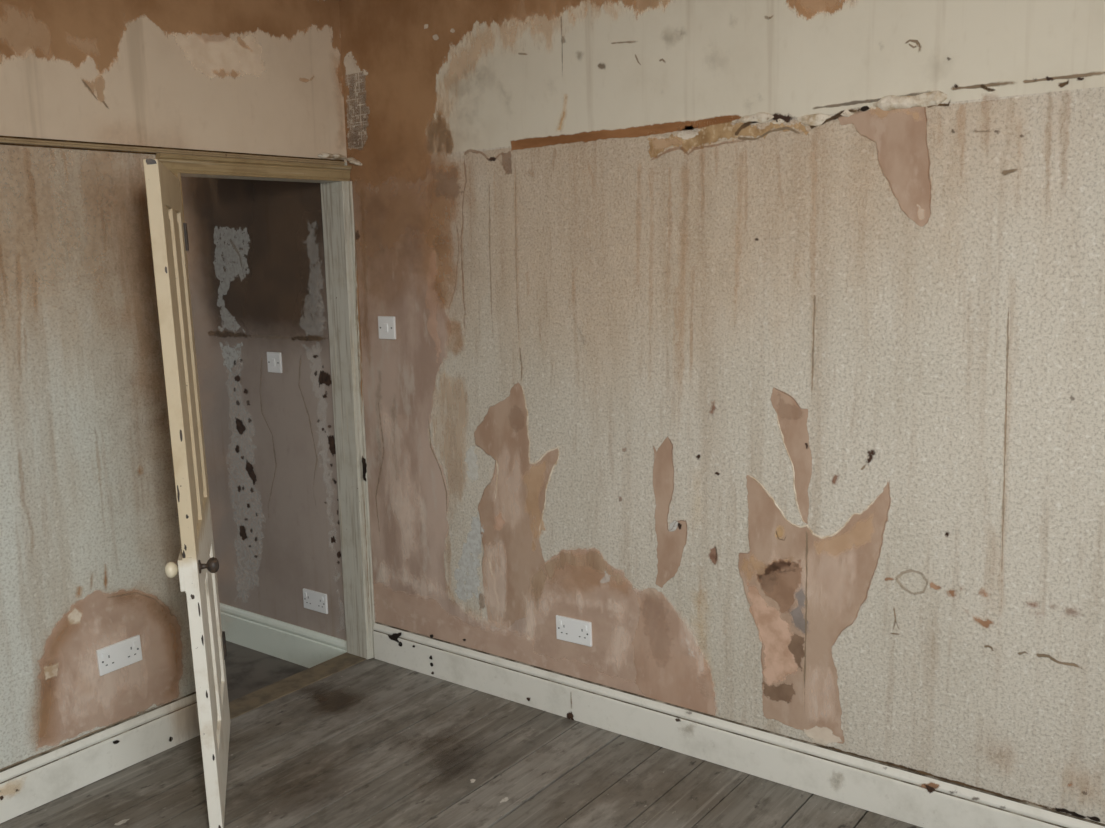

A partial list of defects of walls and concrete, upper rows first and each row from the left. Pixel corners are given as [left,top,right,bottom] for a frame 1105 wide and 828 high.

flaking render [786,0,845,19]
spalling [648,90,950,158]
leakage [355,165,458,304]
flaking render [0,0,716,722]
leakage [38,626,68,738]
peeling [743,556,808,703]
peeling [804,726,842,745]